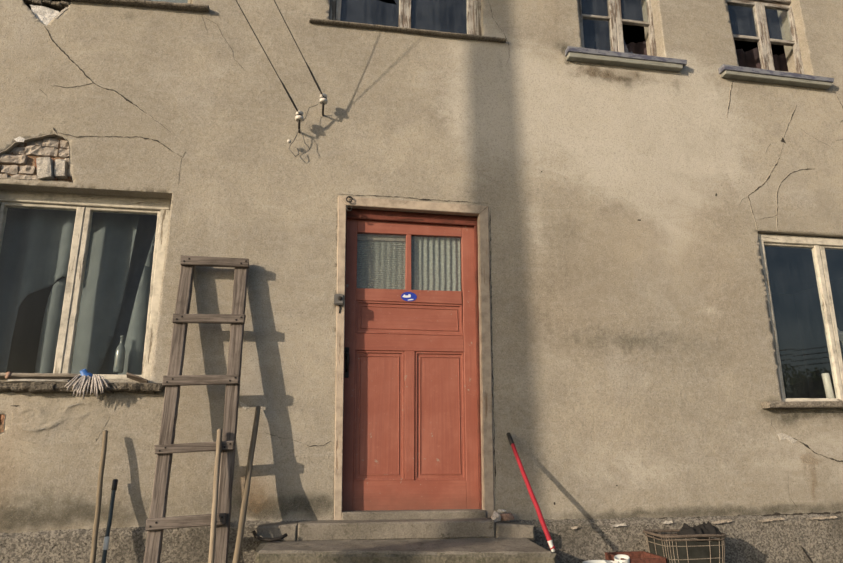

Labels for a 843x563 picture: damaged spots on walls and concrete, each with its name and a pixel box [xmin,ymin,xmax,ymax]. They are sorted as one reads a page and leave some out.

flaking render [24,0,71,26]
crack [41,26,186,168]
crack [726,81,734,118]
flaking render [0,134,73,183]
crack [741,89,843,231]
flaking render [0,384,155,445]
crack [793,438,843,462]
crack [737,477,843,517]